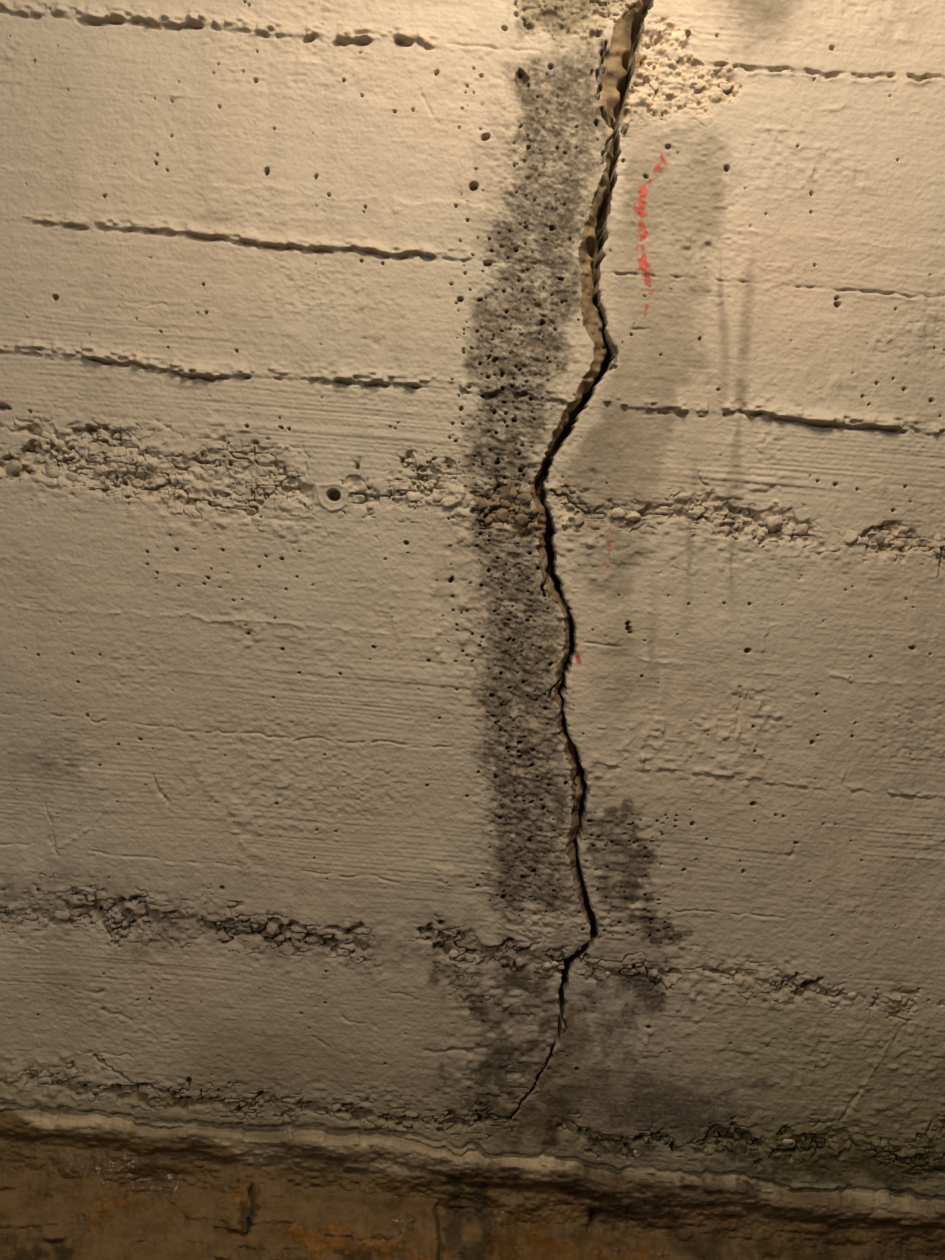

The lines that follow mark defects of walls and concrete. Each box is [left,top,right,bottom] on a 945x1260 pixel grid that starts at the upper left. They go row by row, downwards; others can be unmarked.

spalling [521,0,638,48]
spalling [621,17,743,134]
leakage [462,40,607,488]
crack [487,0,654,1121]
leakage [435,519,573,920]
leakage [584,802,692,944]
leakage [606,958,667,1033]